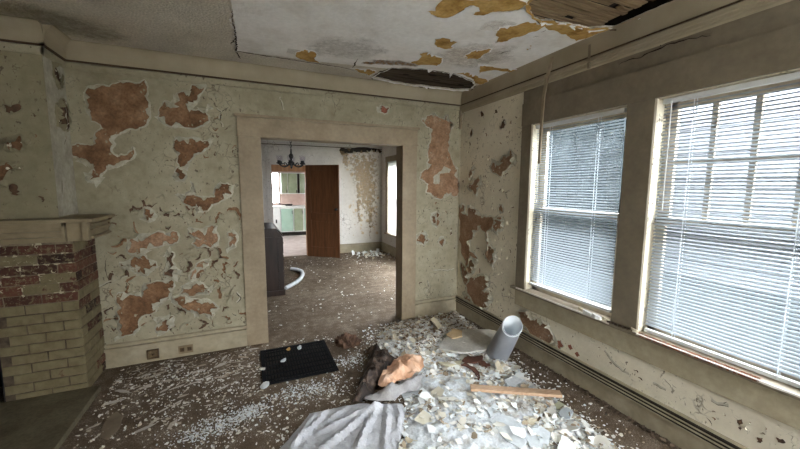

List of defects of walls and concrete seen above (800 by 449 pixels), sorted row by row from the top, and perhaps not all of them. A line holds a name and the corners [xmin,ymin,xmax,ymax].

peeling [352,0,612,91]
peeling [71,79,246,342]
peeling [416,112,522,312]
peeling [0,243,75,299]
peeling [517,309,588,360]